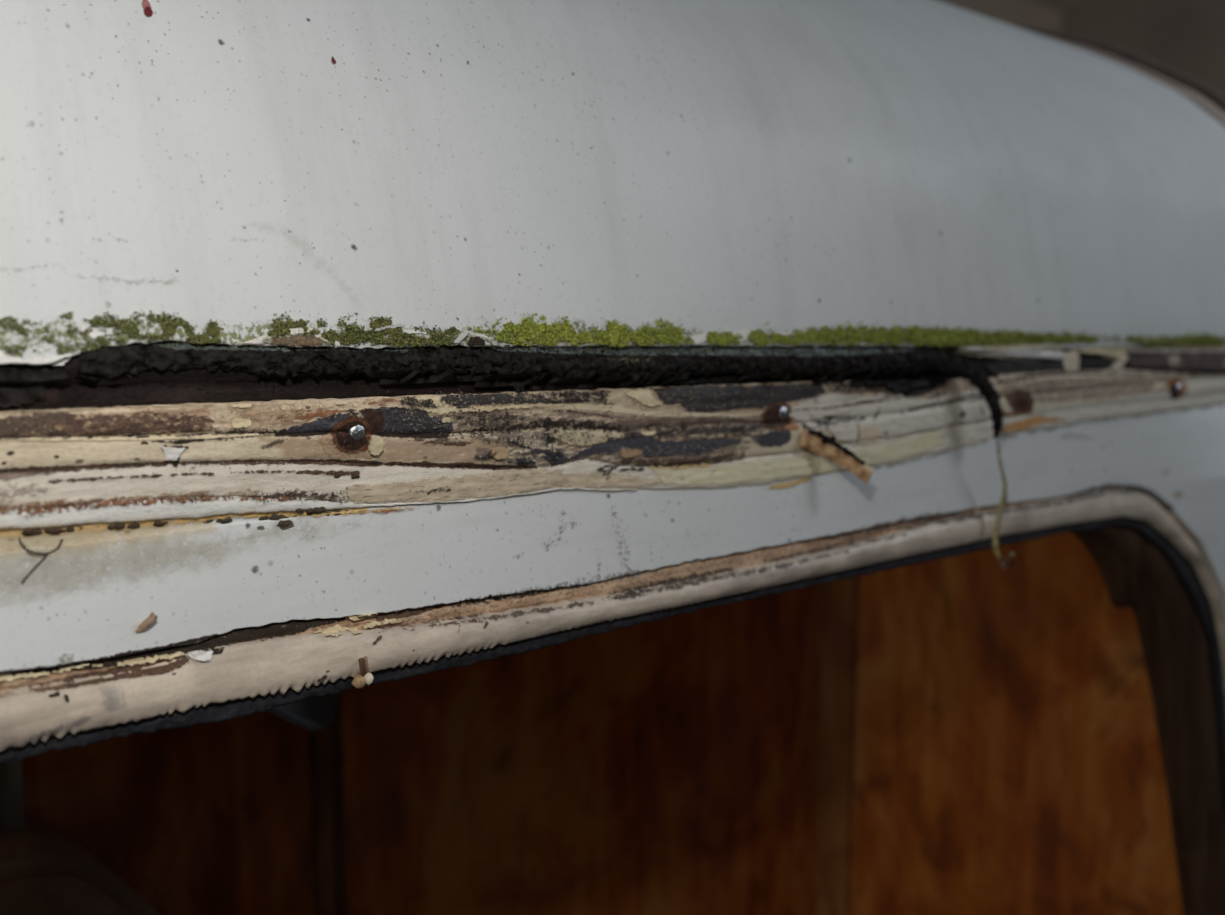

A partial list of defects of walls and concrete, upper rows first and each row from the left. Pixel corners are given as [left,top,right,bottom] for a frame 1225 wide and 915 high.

leakage [151,341,409,353]
leakage [489,344,914,362]
rust [1099,377,1187,400]
peeling [0,402,275,442]
rust [230,398,394,459]
peeling [368,435,383,455]
peeling [397,389,761,446]
spalling [789,386,991,484]
peeling [0,482,48,498]
peeling [313,613,402,637]
peeling [0,650,213,682]